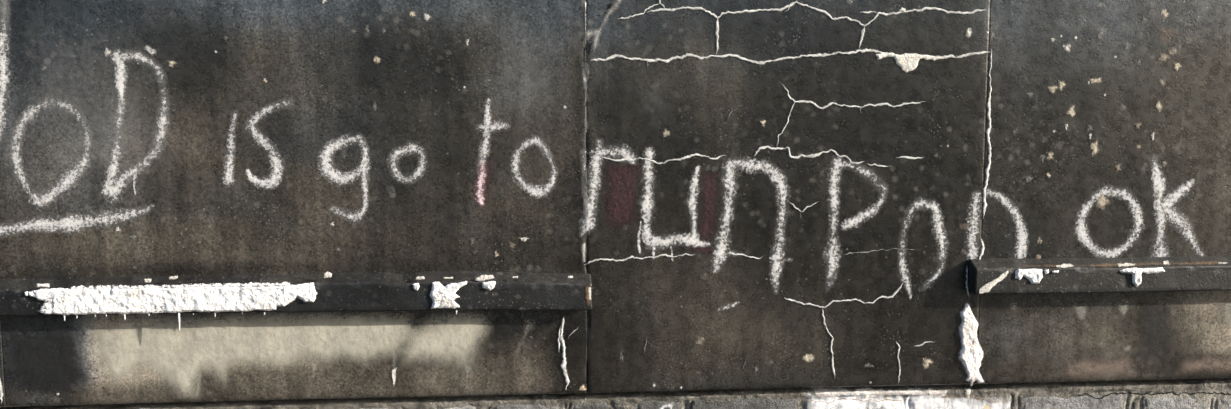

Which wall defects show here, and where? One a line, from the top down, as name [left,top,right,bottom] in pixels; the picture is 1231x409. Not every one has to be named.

crack [585,0,992,295]
damp [16,281,483,392]
crack [785,283,931,404]